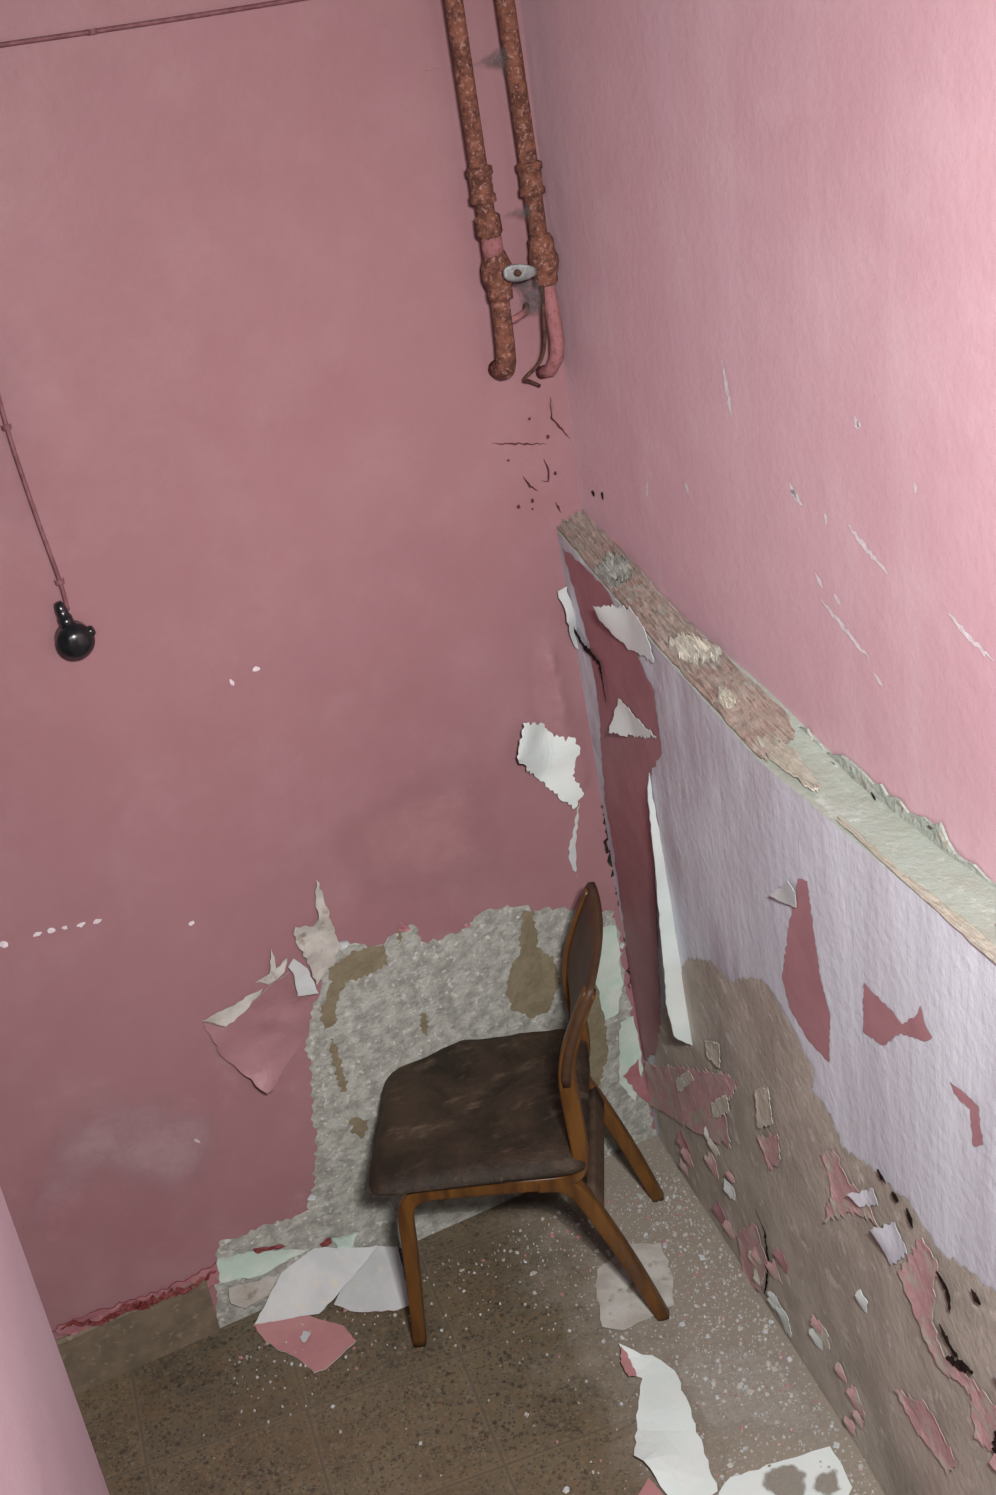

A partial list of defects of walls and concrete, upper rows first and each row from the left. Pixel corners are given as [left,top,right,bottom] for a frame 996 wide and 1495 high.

peeling [33,919,102,937]
peeling [52,509,996,1495]